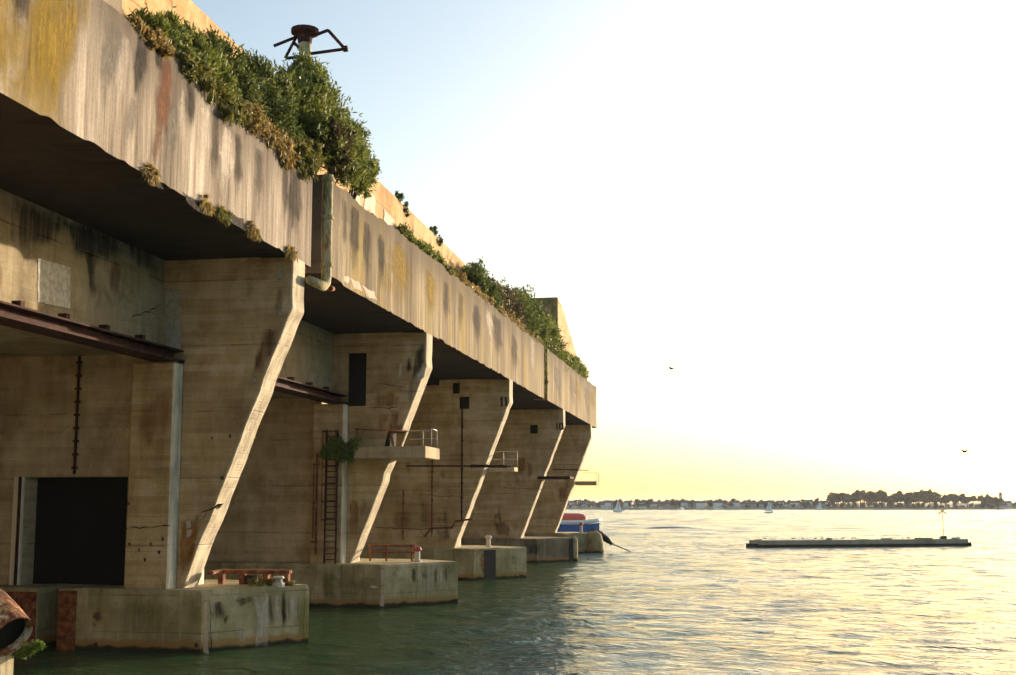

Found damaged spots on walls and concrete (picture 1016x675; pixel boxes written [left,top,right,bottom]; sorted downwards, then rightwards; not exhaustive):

rust [155,60,172,151]
water stain [351,208,406,291]
water stain [407,346,424,377]
water stain [474,307,517,362]
rust [181,516,198,570]